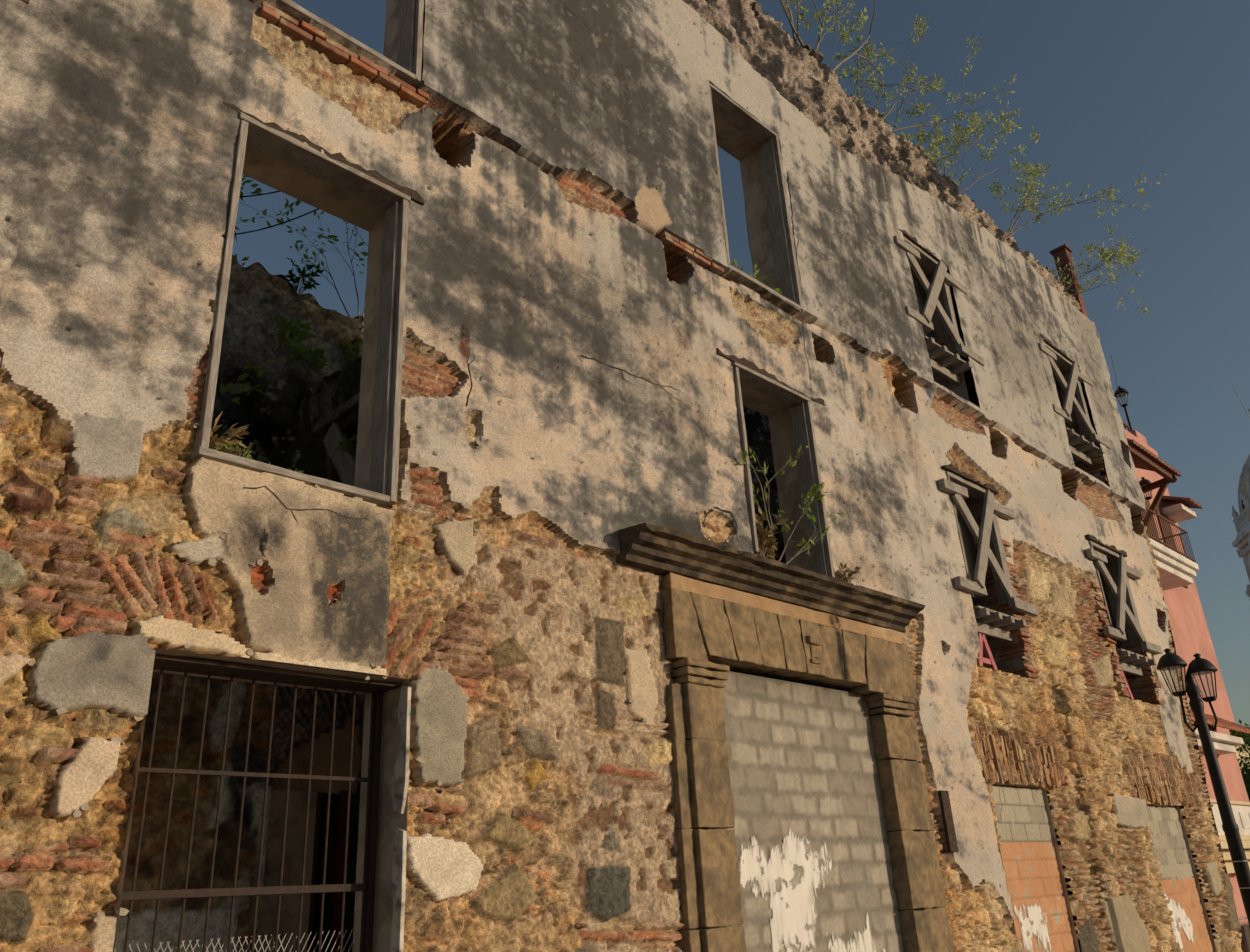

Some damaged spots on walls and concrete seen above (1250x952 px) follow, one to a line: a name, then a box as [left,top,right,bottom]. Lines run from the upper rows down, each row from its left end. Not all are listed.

spalling [250,5,476,169]
spalling [554,167,695,286]
flaking render [68,411,145,485]
crack [243,486,381,529]
spalling [401,326,469,399]
crack [580,355,700,417]
spalling [875,348,1012,506]
flaking render [0,457,395,722]
flaking render [47,736,122,819]
flaking render [390,665,483,952]
flaking render [88,907,129,952]
peeling [740,830,885,952]